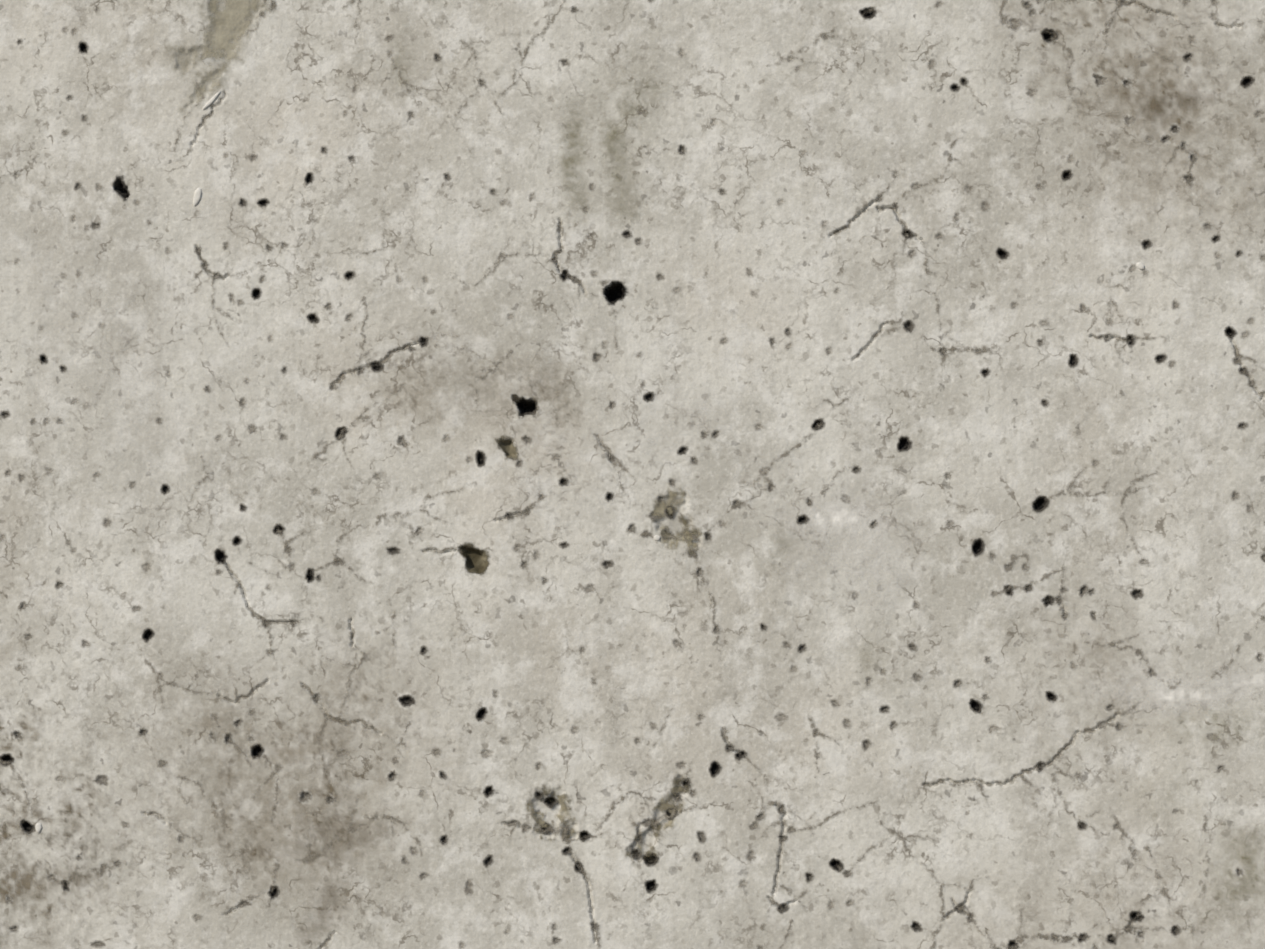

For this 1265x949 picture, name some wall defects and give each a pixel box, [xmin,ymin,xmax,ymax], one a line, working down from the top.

crack [459,5,561,113]
crack [834,140,956,312]
crack [362,297,410,363]
crack [856,319,901,357]
crack [314,408,369,458]
crack [924,706,1135,794]
crack [1065,809,1164,933]